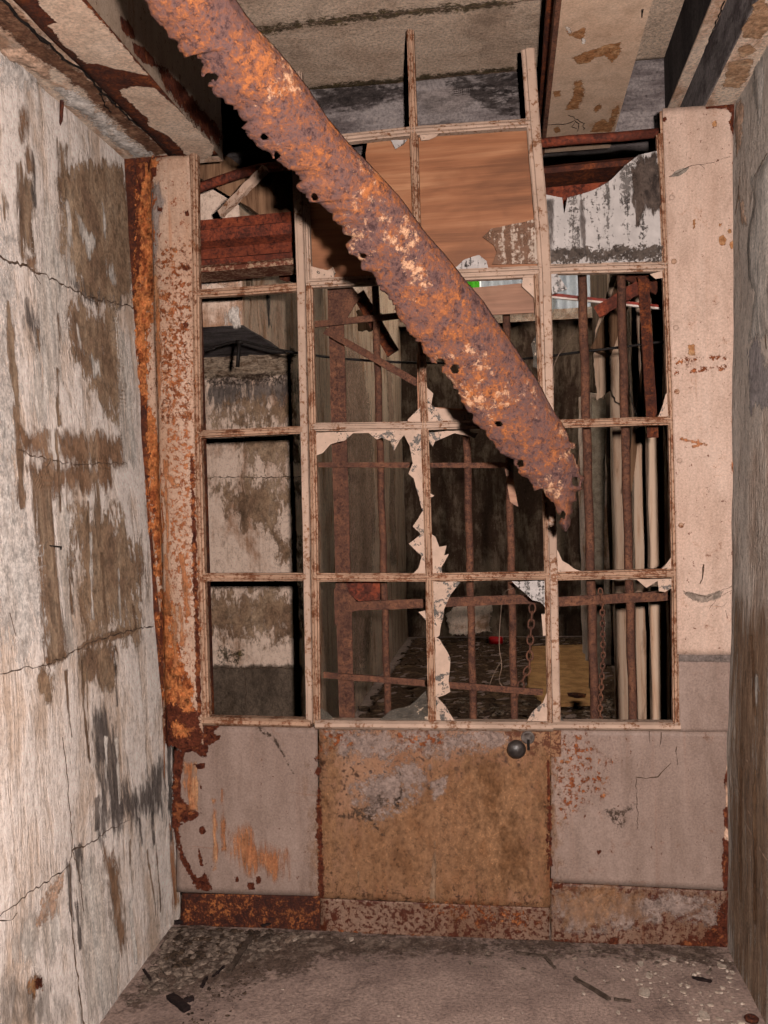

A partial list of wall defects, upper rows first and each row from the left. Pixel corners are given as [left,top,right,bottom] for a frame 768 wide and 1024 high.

peeling [566,27,586,44]
crack [0,255,133,309]
corrosion [674,344,727,375]
corrosion [0,1,288,904]
damp [0,108,173,1024]
crack [2,626,153,675]
crack [0,737,128,1024]
corrosion [314,730,353,912]
corrosion [397,730,443,750]
corrosion [546,732,613,889]
corrosion [676,771,729,947]